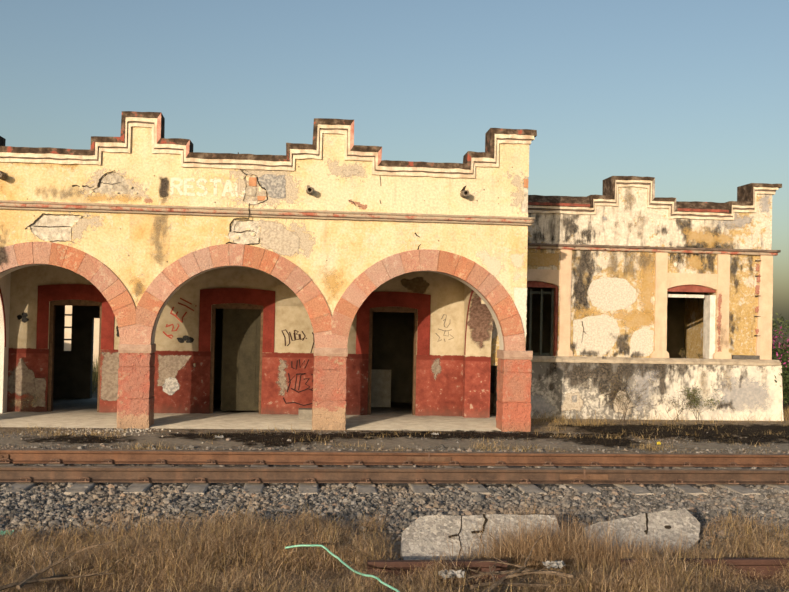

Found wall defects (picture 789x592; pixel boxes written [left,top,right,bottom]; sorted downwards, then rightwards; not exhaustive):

spalling [72,170,153,203]
spalling [240,175,268,205]
spalling [25,213,87,243]
flaking render [226,219,300,256]
leakage [527,252,559,267]
leakage [670,218,752,288]
peeling [467,294,494,348]
leakage [539,215,729,409]
peeling [7,359,46,407]
peeling [101,352,120,401]
peeling [157,355,196,395]
peeling [278,360,288,396]